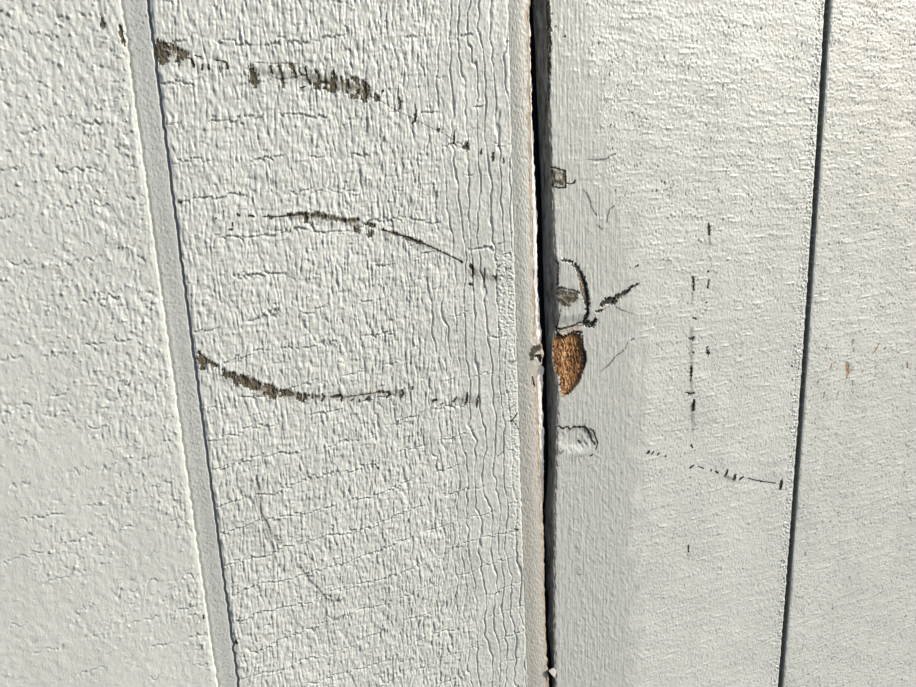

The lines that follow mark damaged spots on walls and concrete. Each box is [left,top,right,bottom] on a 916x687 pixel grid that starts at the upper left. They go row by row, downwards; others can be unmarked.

peeling [155,38,229,73]
peeling [248,61,470,151]
crack [215,210,497,286]
peeling [555,258,597,336]
peeling [196,351,414,403]